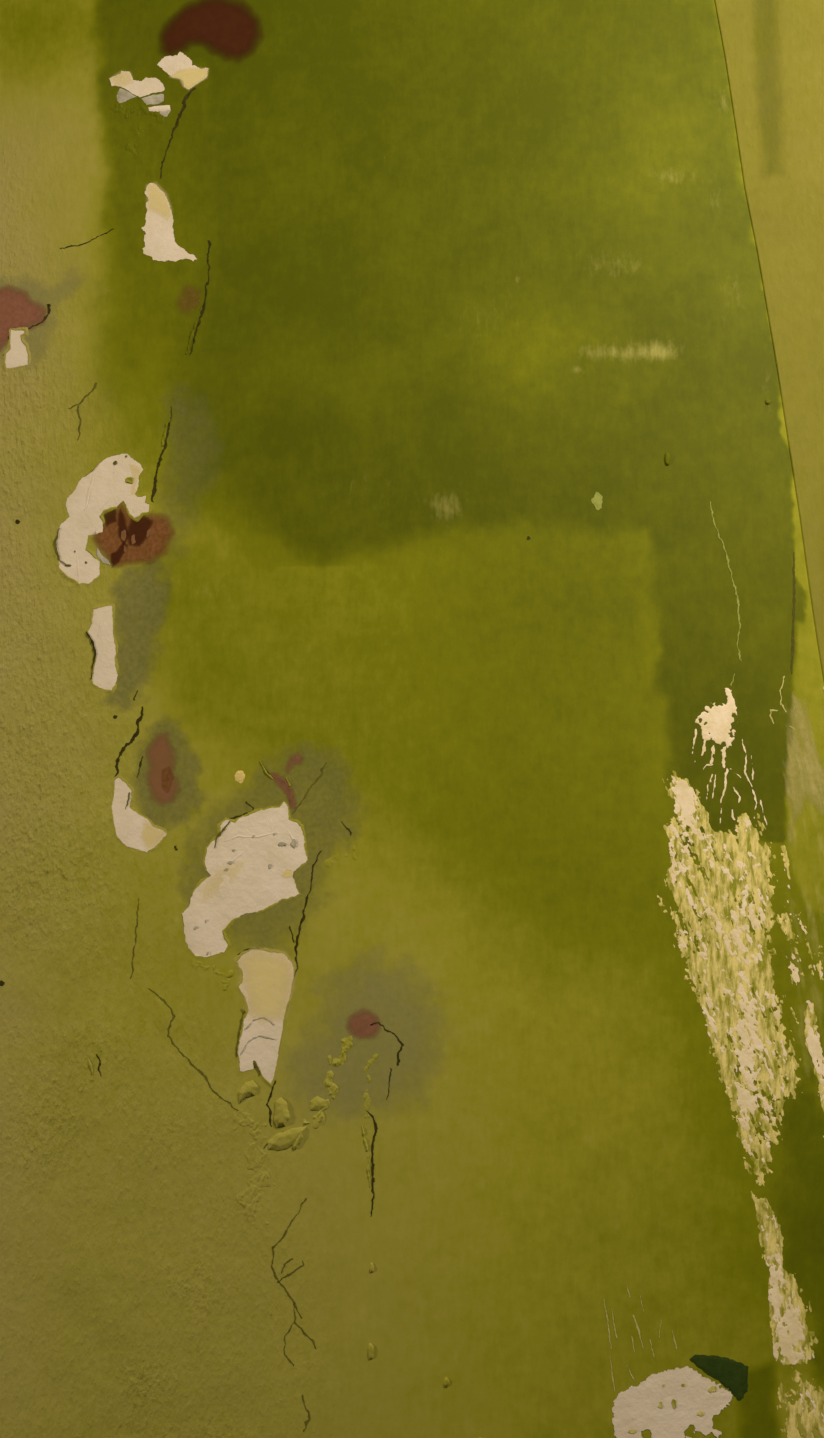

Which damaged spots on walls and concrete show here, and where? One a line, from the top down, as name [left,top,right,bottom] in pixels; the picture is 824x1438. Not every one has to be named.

rust [162,0,258,57]
peeling [139,180,200,265]
rust [0,288,45,348]
crack [185,240,211,355]
peeling [50,449,154,589]
rust [94,506,172,565]
leakage [114,571,164,701]
peeling [179,797,311,1089]
rust [349,1012,379,1036]
peeling [657,688,824,1438]
crack [271,1198,316,1432]
peeling [612,1366,732,1438]